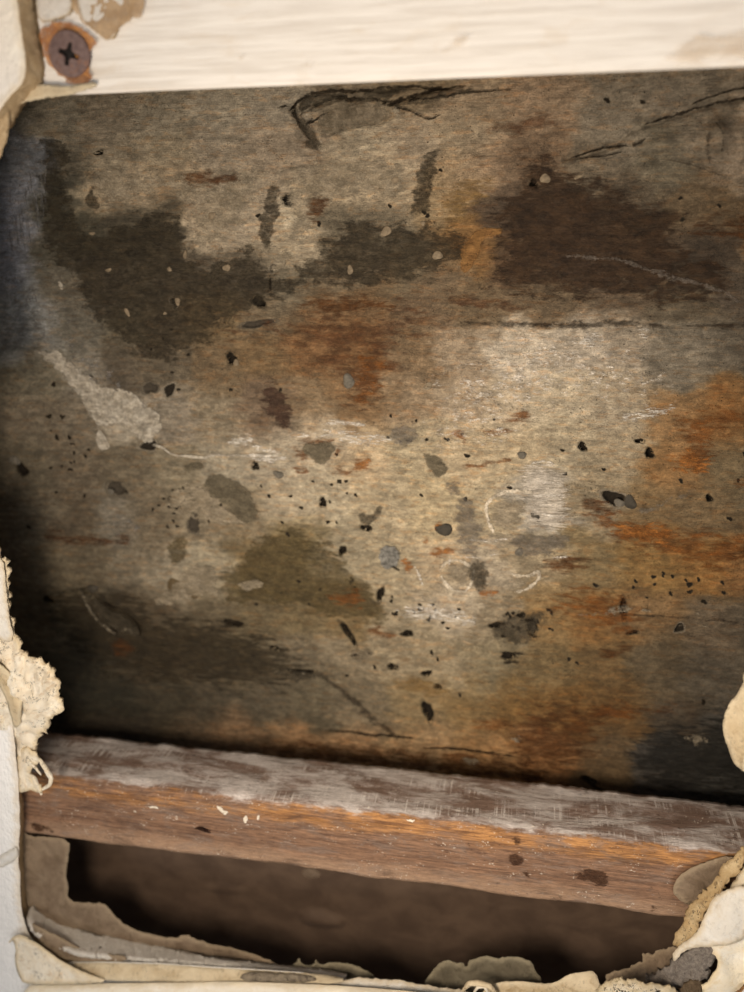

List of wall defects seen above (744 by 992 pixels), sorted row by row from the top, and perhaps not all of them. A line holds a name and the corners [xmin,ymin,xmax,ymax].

rust [39,21,97,84]
crack [279,85,510,150]
leakage [11,139,467,362]
leakage [482,154,726,310]
rust [276,296,423,411]
rust [260,382,293,429]
rust [667,405,744,473]
peeling [723,675,744,771]
flaking render [26,905,347,980]
flaking render [645,947,716,992]